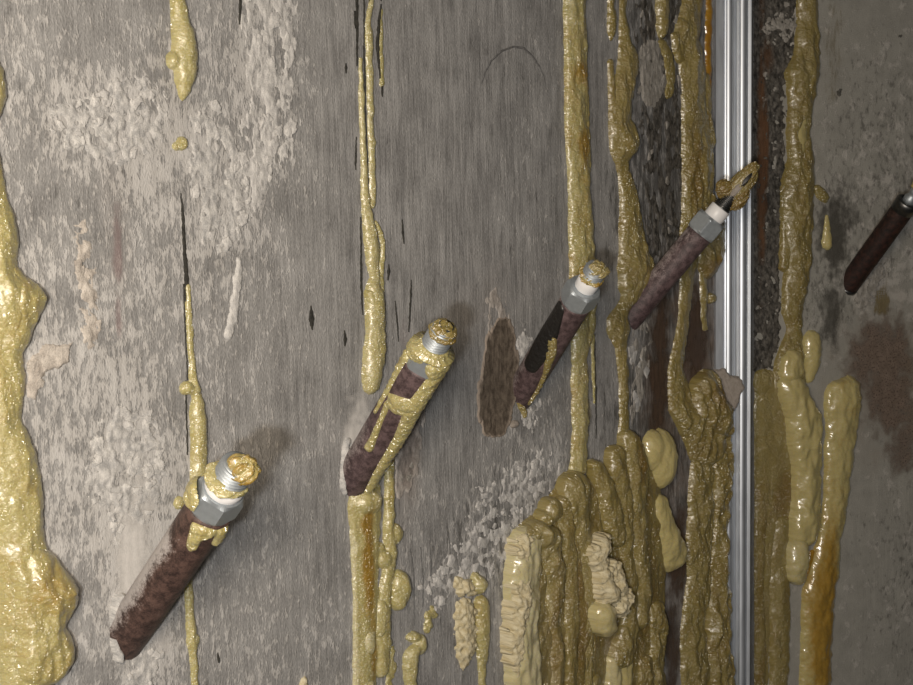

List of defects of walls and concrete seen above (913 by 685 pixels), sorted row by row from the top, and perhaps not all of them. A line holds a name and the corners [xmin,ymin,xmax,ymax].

crack [354,0,383,184]
crack [180,193,189,455]
crack [357,217,365,315]
spalling [477,287,542,438]